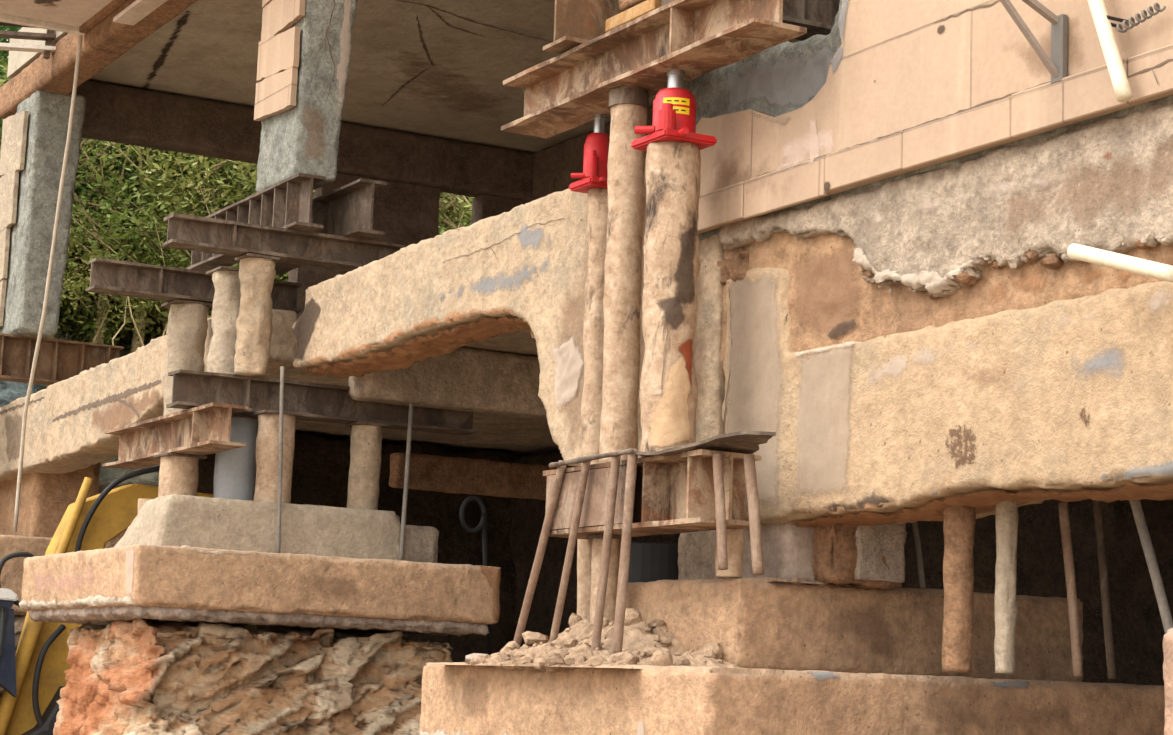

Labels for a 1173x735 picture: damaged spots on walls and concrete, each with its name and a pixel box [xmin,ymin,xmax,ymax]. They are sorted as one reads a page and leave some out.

crack [143,11,189,89]
crack [316,0,337,103]
crack [382,0,551,106]
spalling [717,101,1173,300]
spalling [293,298,534,379]
leakage [945,425,976,468]